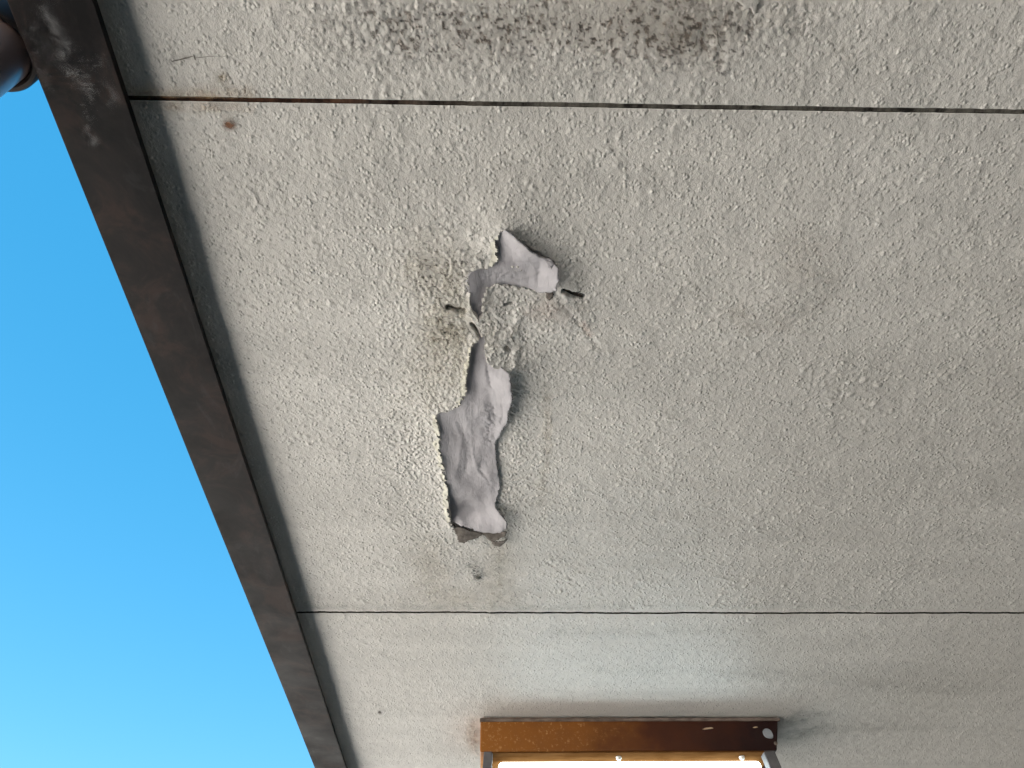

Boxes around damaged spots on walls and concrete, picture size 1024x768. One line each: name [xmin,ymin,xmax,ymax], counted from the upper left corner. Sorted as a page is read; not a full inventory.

damp [442,2,714,54]
peeling [466,230,560,317]
peeling [432,335,513,547]